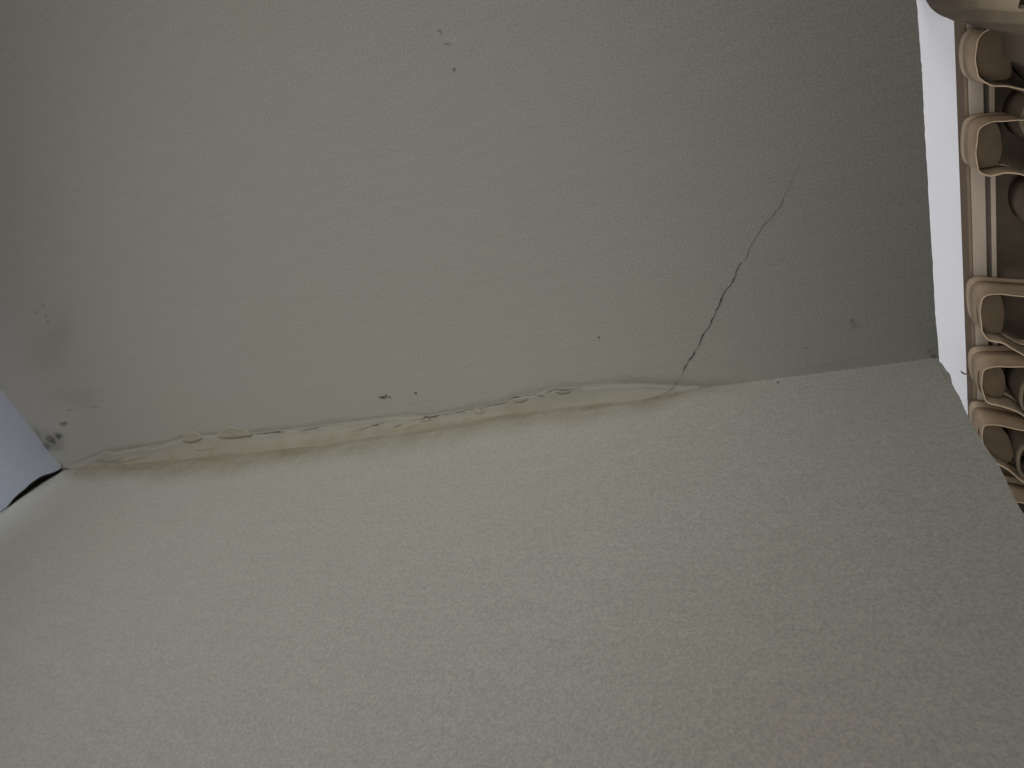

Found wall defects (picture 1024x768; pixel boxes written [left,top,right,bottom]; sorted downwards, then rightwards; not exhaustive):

crack [671,214,774,390]